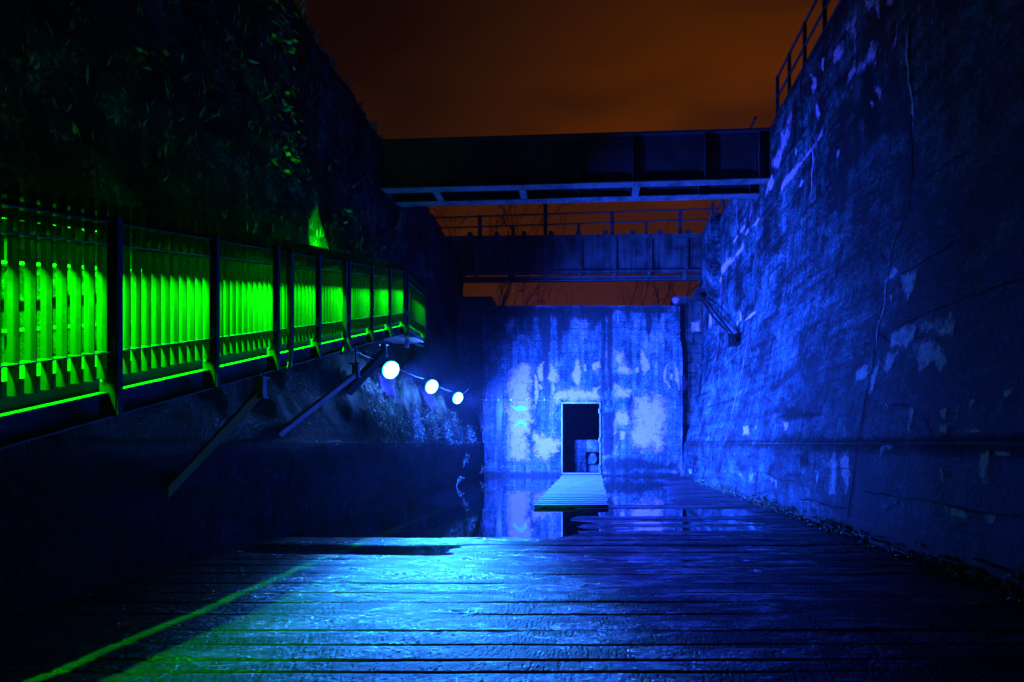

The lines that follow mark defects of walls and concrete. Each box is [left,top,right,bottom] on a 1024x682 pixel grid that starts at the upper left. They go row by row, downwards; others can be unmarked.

damp [484,304,680,476]
crack [736,9,1020,519]